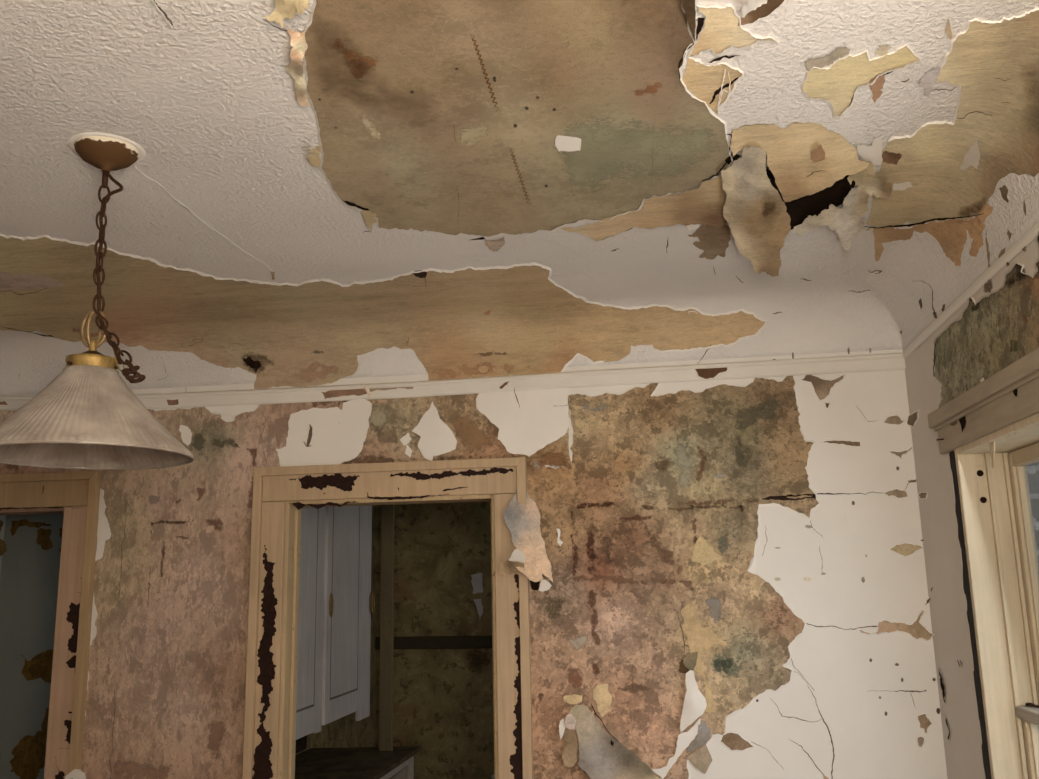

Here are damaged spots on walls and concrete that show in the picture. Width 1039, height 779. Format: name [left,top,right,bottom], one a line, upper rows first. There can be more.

crack [150,0,174,29]
peeling [682,4,780,114]
peeling [801,44,921,119]
peeling [864,7,1039,228]
peeling [560,146,791,277]
peeling [695,367,727,379]
peeling [252,545,278,779]
peeling [497,489,553,779]
peeling [559,652,707,779]
crack [751,659,835,779]
crack [806,587,935,641]
crack [871,660,962,739]